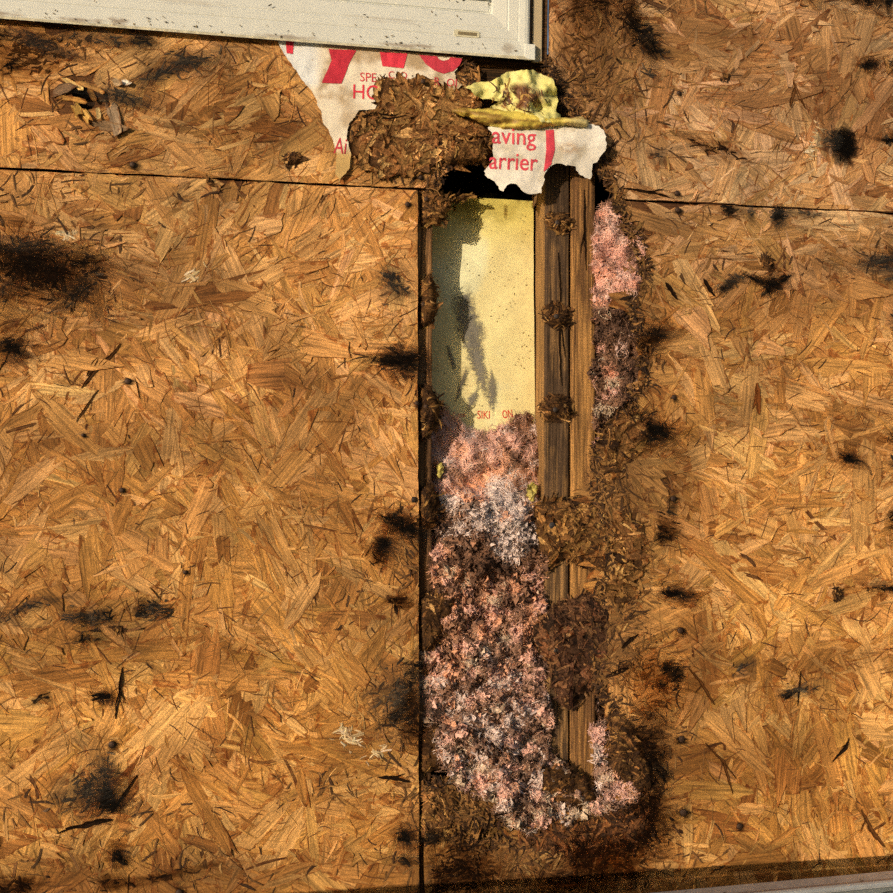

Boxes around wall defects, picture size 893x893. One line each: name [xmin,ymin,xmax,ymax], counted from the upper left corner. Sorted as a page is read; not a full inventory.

spalling [53,77,132,137]
leakage [0,229,108,314]
leakage [181,262,206,283]
leakage [717,273,792,297]
leakage [371,346,428,377]
peeling [447,293,497,409]
peeling [655,506,681,543]
leakage [60,605,115,646]
leakage [135,599,174,621]
peeling [655,659,686,692]
leakage [61,741,129,817]
peeling [618,713,683,866]